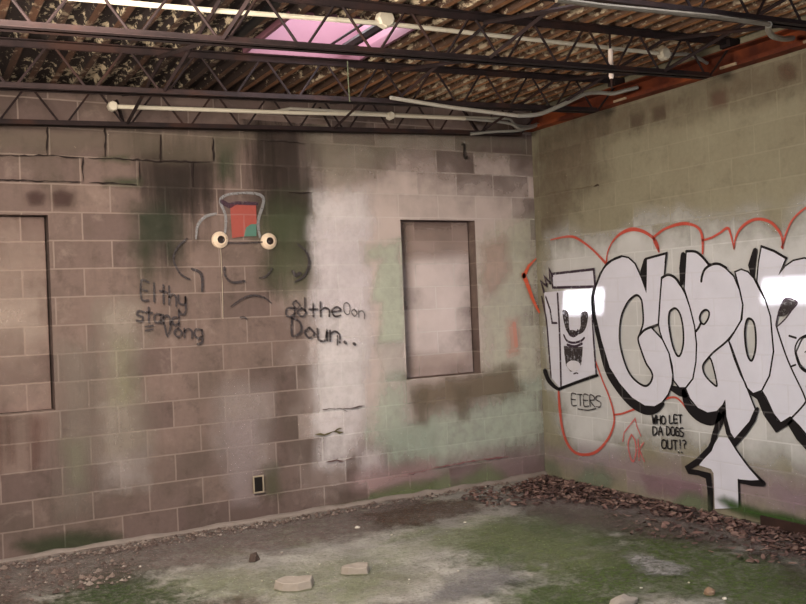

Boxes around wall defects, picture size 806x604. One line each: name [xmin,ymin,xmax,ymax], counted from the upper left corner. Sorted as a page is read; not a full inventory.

water stain [141,140,211,210]
water stain [257,122,309,216]